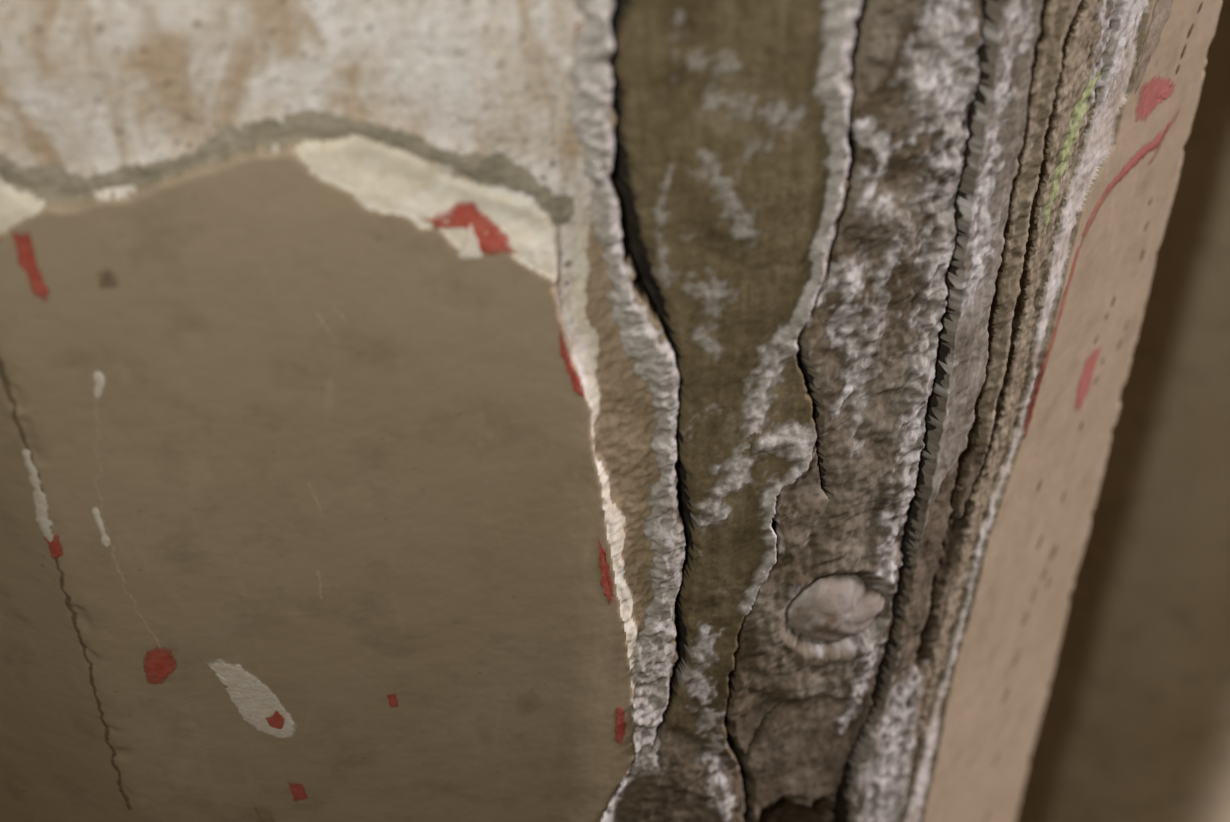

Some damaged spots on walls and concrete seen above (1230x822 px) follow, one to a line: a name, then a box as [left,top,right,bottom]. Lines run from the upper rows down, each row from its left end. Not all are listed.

spalling [0,0,662,751]
crack [609,0,695,748]
crack [723,645,789,822]
crack [771,518,779,545]
crack [796,332,831,497]
crack [815,0,869,303]
spalling [608,0,1203,822]
crack [830,0,1087,822]